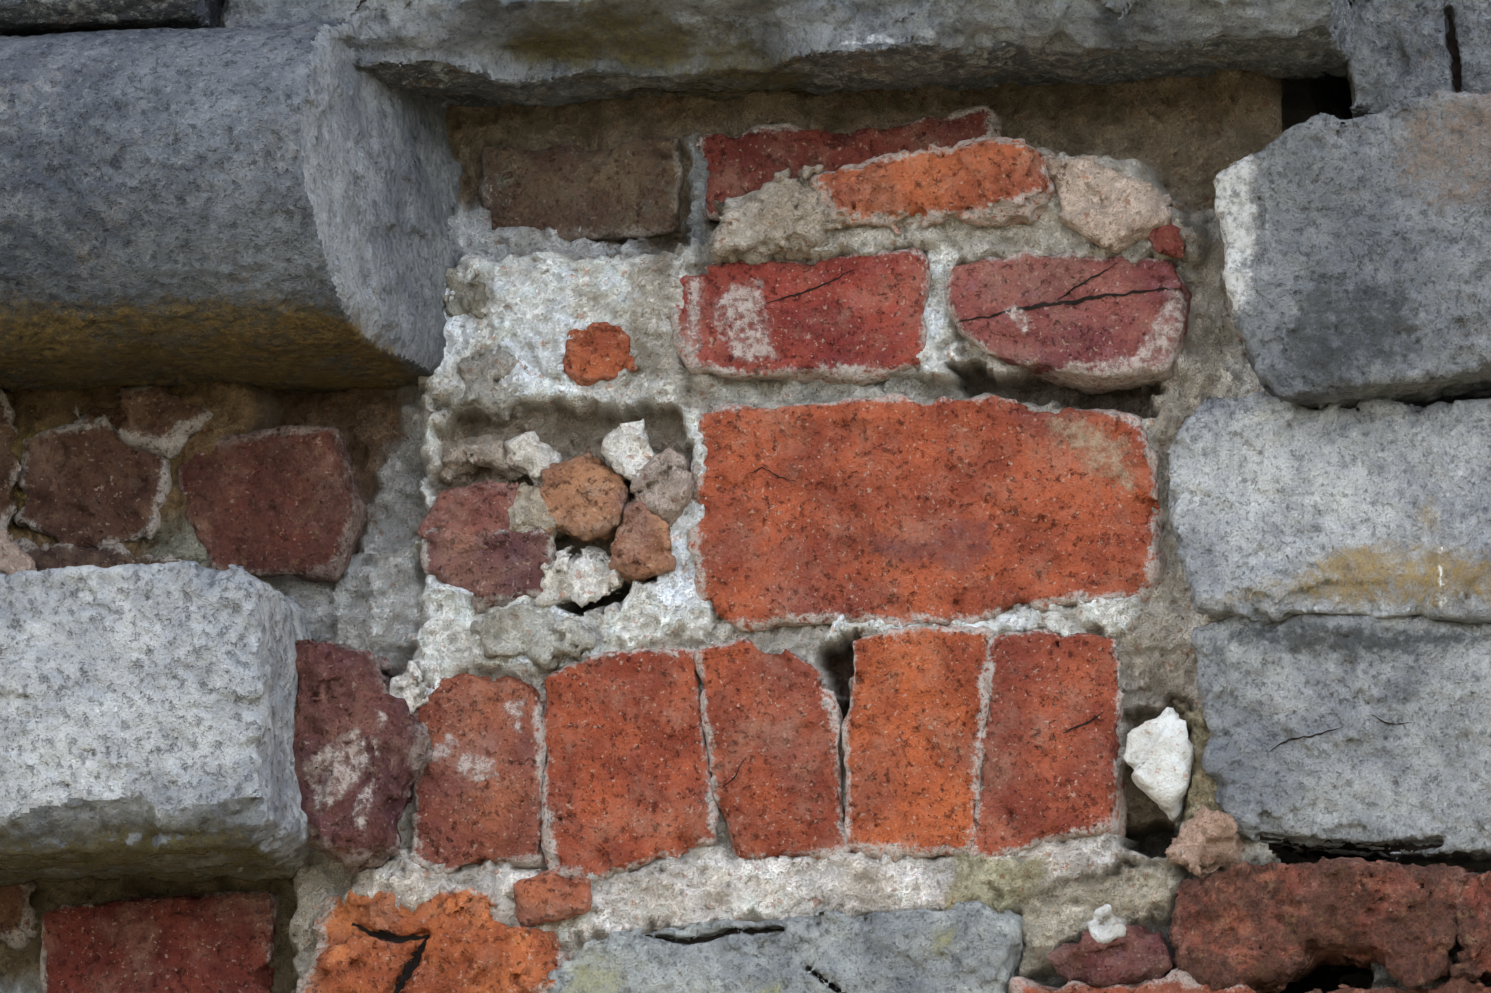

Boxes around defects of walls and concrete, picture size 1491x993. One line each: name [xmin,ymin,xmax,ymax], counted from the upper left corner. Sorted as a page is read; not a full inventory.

spalling [195,0,1334,372]
crack [955,262,1180,328]
spalling [314,887,533,993]